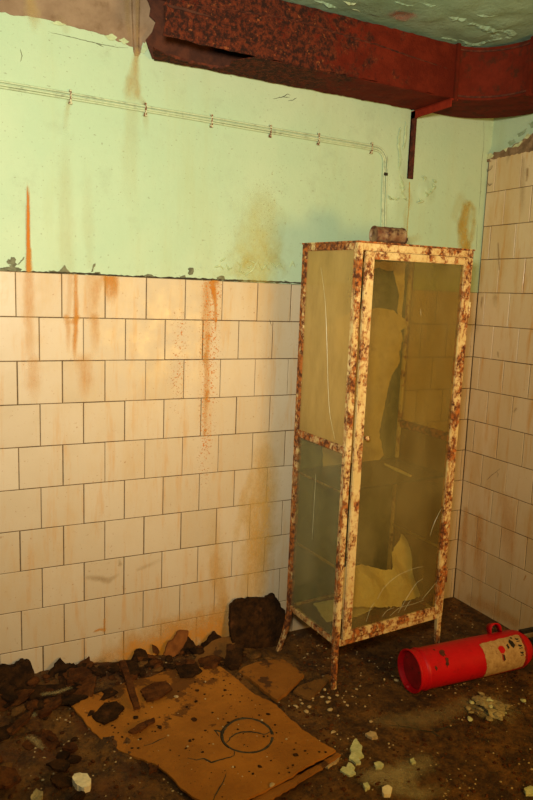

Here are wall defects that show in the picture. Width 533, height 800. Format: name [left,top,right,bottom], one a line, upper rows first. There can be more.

peeling [0,0,155,57]
peeling [441,15,517,47]
flaking render [487,122,533,162]
water stain [459,205,469,249]
rust [66,275,79,346]
rust [199,281,222,471]